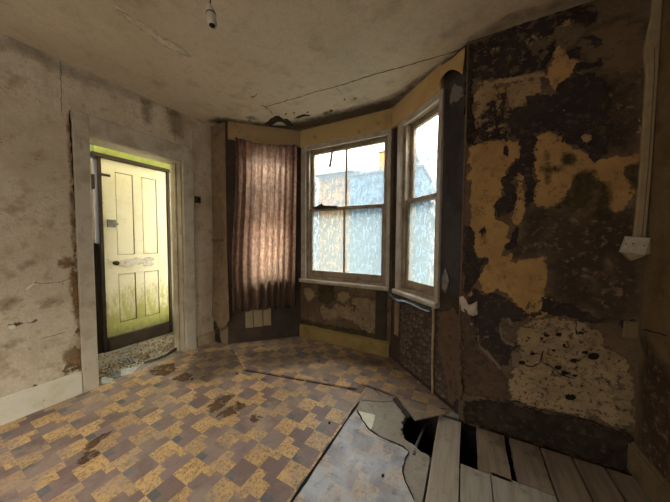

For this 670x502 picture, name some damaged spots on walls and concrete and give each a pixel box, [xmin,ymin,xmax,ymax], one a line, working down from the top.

peeling [266,114,311,126]
leakage [212,86,413,131]
crack [250,49,461,113]
peeling [449,83,464,104]
leakage [462,4,642,367]
spalling [463,45,640,472]
peeling [319,291,375,336]